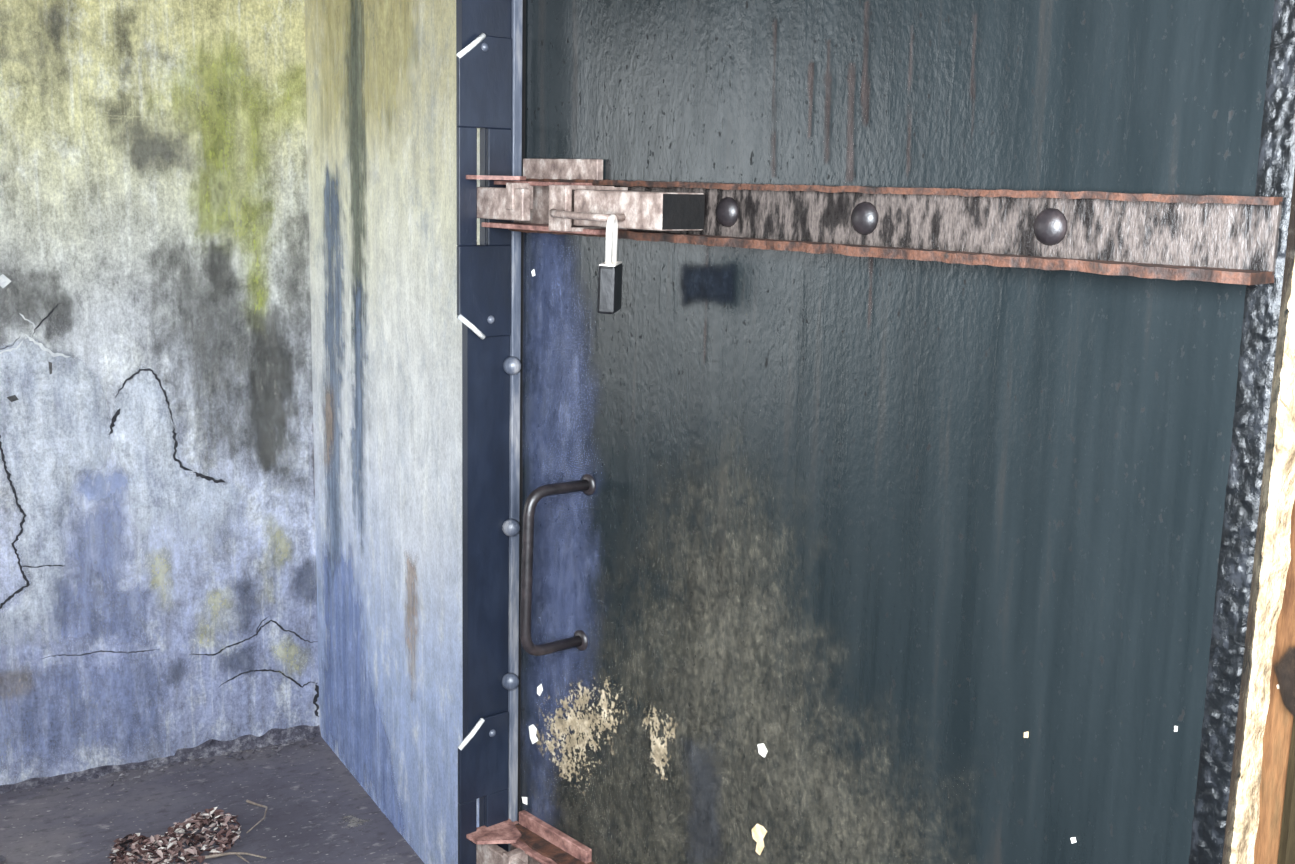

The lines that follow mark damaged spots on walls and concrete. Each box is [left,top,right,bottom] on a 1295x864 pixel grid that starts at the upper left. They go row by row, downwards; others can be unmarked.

water stain [0,274,66,329]
crack [0,303,71,358]
crack [108,369,226,483]
crack [0,435,65,609]
crack [43,616,319,717]
spalling [0,725,322,794]